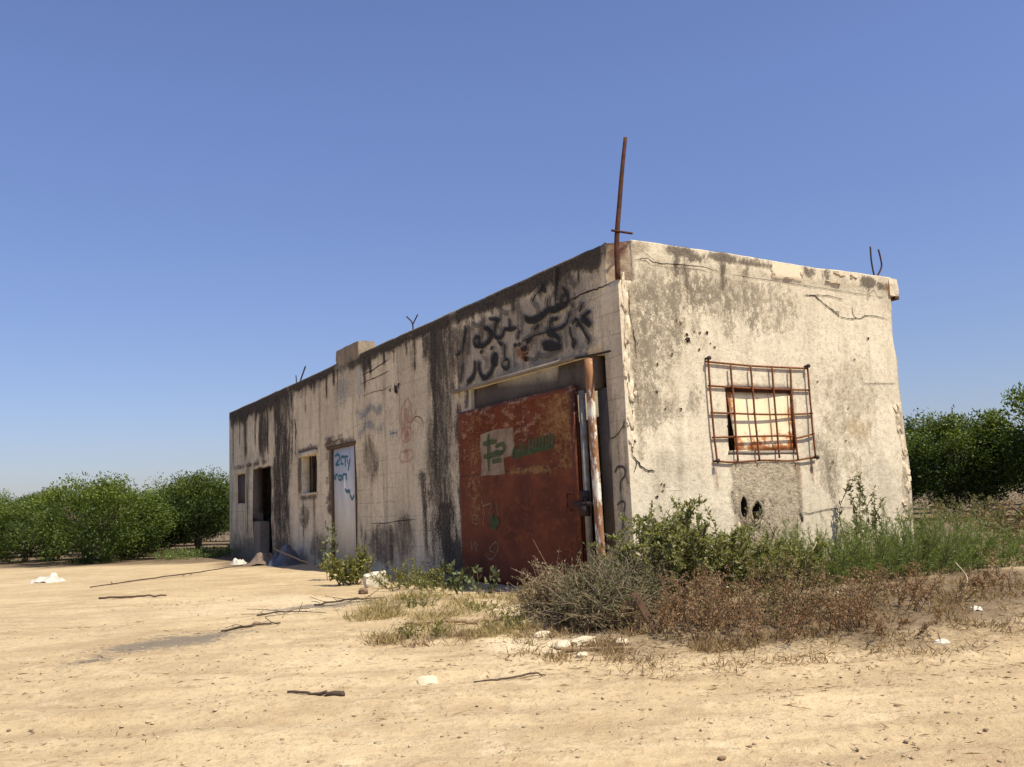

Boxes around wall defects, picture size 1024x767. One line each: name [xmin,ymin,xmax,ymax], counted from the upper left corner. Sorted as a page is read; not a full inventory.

crack [636,251,888,320]
water stain [859,275,887,297]
crack [362,358,392,396]
water stain [230,246,601,577]
rust [511,391,572,474]
water stain [626,245,801,433]
spalling [730,460,804,552]